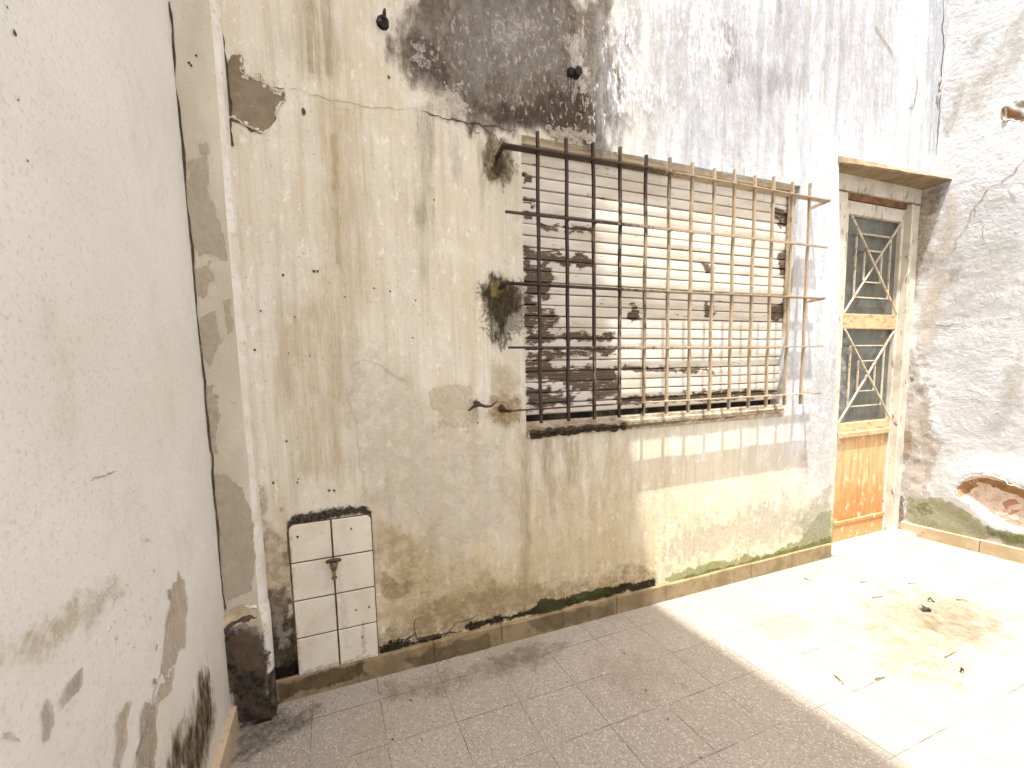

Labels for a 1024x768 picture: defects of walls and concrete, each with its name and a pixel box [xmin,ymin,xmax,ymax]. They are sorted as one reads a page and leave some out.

flaking render [227,54,287,135]
crack [293,88,516,142]
water stain [387,0,893,187]
flaking render [1001,107,1024,124]
water stain [480,271,525,350]
rust [491,395,519,425]
flaking render [955,473,1024,533]
peeling [213,474,259,635]
water stain [377,535,656,654]
peeling [99,569,188,768]
water stain [225,585,298,727]
water stain [169,669,216,768]